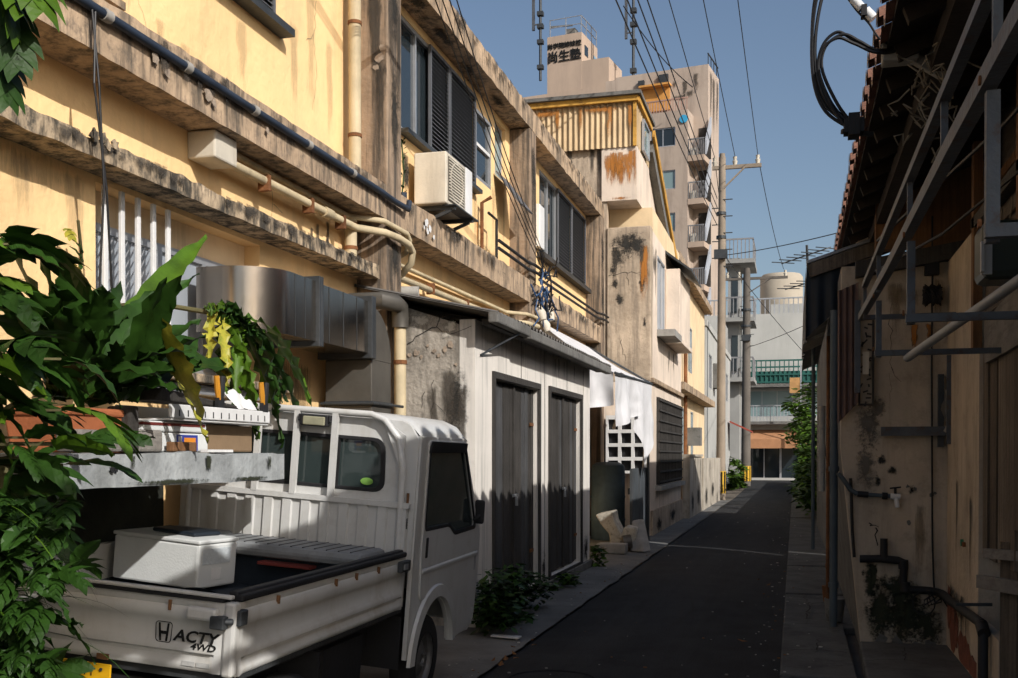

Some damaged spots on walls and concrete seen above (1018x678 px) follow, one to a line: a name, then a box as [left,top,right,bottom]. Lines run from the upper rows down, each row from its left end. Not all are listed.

water stain [184,58,229,101]
water stain [60,124,84,143]
water stain [137,157,185,185]
corrosion [604,150,636,183]
water stain [226,196,373,268]
water stain [561,233,657,328]
water stain [428,372,467,437]
water stain [876,455,896,486]
mould [862,563,943,644]